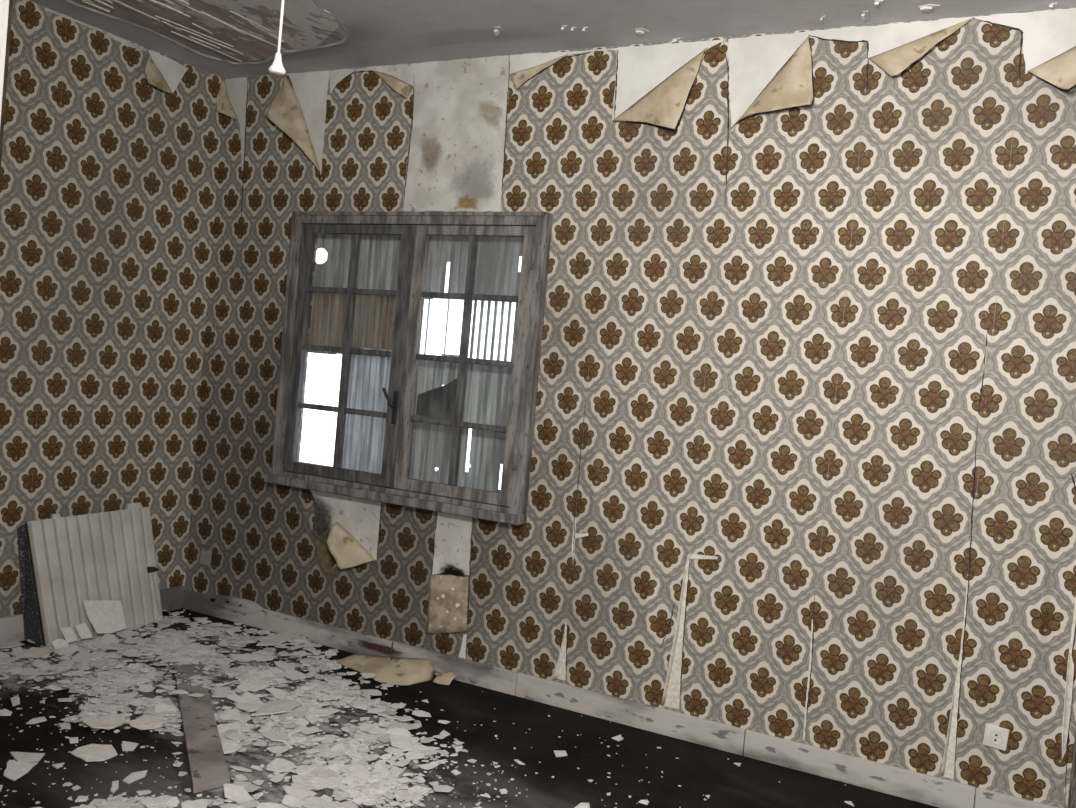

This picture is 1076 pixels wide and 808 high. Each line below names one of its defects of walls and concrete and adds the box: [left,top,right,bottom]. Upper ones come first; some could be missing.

flaking render [45,8,189,93]
flaking render [225,77,248,171]
leakage [424,141,438,167]
flaking render [288,0,1076,212]
flaking render [310,490,381,561]
flaking render [426,512,473,659]
flaking render [557,623,567,681]
flaking render [663,554,690,709]
flaking render [1062,599,1076,759]